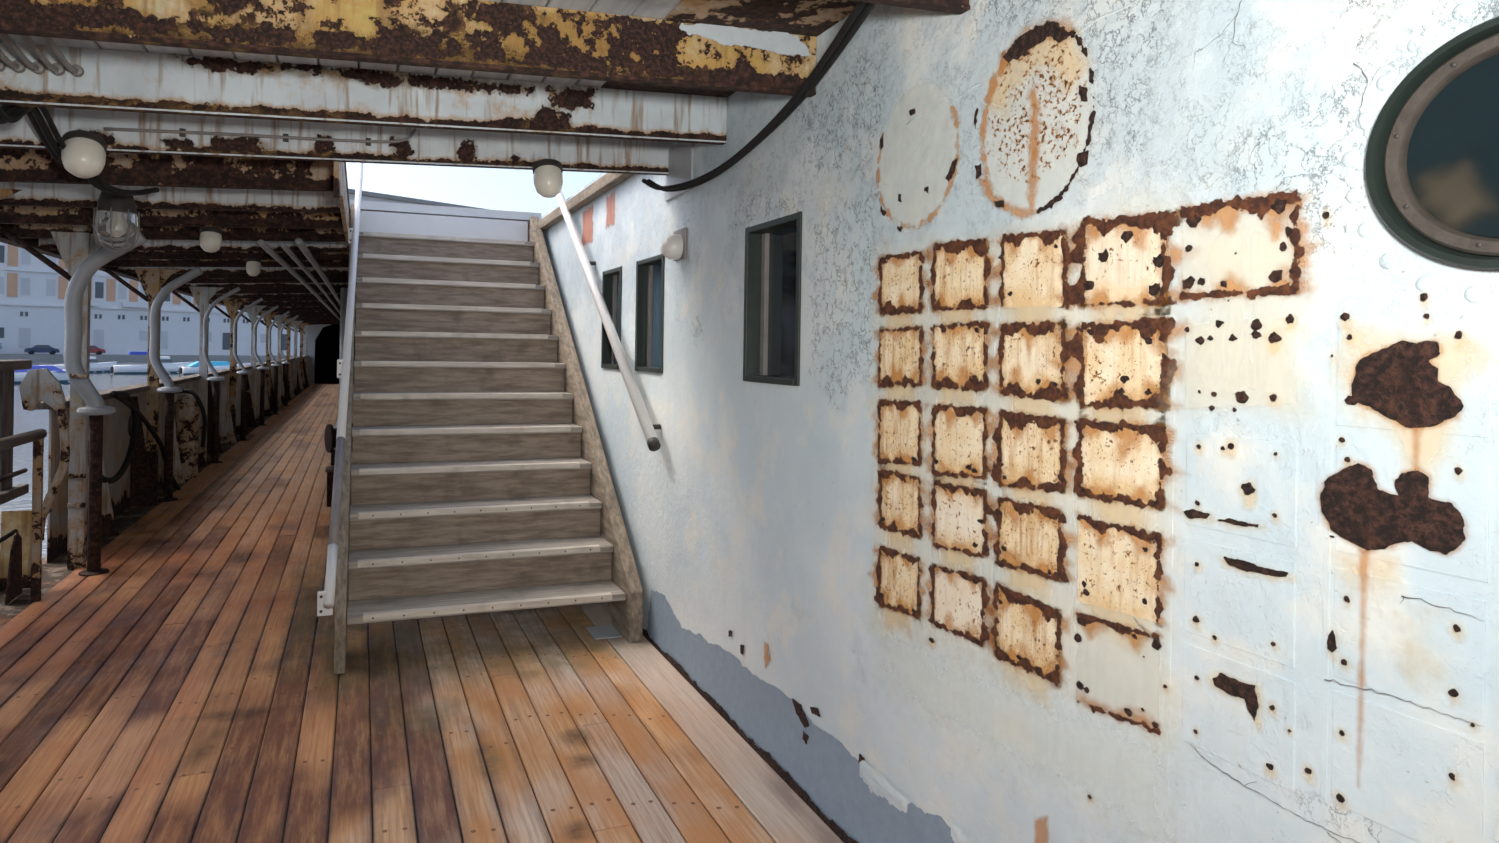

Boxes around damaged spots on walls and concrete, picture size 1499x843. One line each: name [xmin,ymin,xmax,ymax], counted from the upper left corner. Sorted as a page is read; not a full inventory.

rust [0,0,703,135]
rust [17,92,338,157]
rust [389,136,415,161]
rust [456,138,480,164]
rust [876,135,937,232]
rust [924,20,1096,216]
rust [1345,340,1464,428]
rust [1320,463,1466,575]
peeling [647,590,982,843]